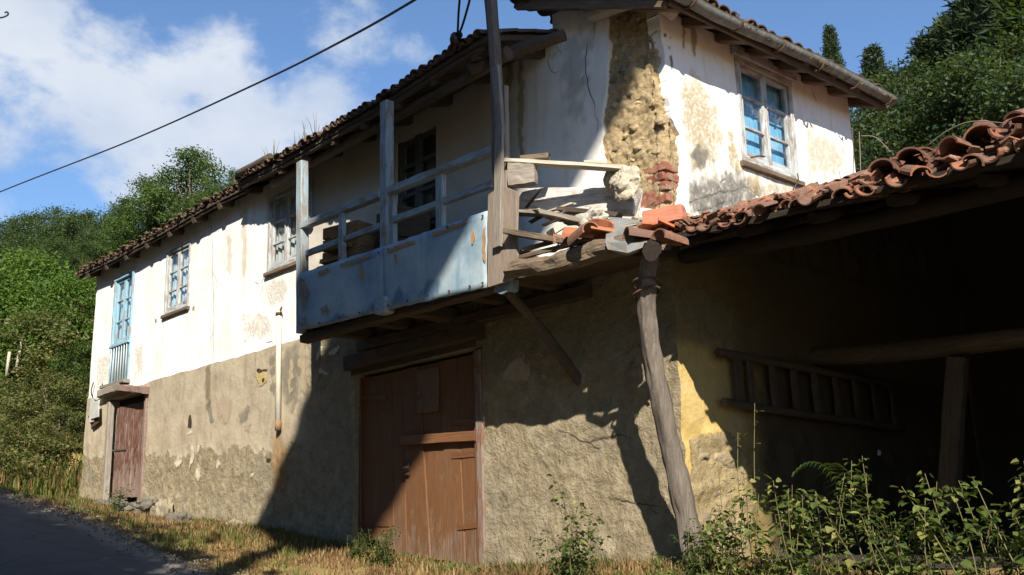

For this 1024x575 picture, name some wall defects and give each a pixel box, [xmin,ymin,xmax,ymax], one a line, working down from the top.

crack [548,22,599,131]
flaking render [603,9,679,209]
leakage [690,144,756,213]
flaking render [174,415,201,482]
flaking render [689,431,753,563]